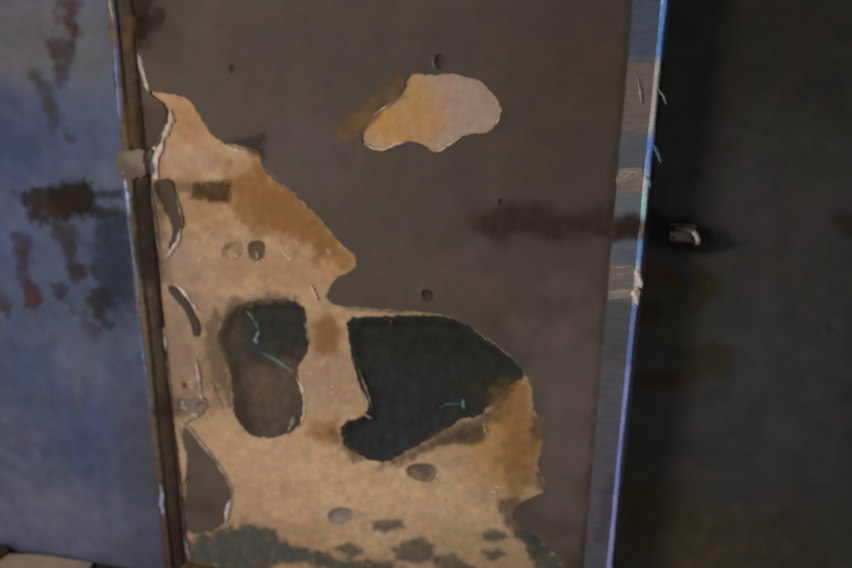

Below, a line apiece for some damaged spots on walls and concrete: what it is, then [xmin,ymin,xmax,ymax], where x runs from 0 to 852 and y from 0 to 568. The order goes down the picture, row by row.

rust [22,182,121,278]
rust [132,186,154,280]
water stain [648,212,731,252]
rust [18,241,40,307]
peeling [134,23,546,568]
water stain [188,525,392,568]
water stain [373,521,403,531]
water stain [392,539,473,568]
water stain [483,531,505,541]
water stain [516,529,563,568]